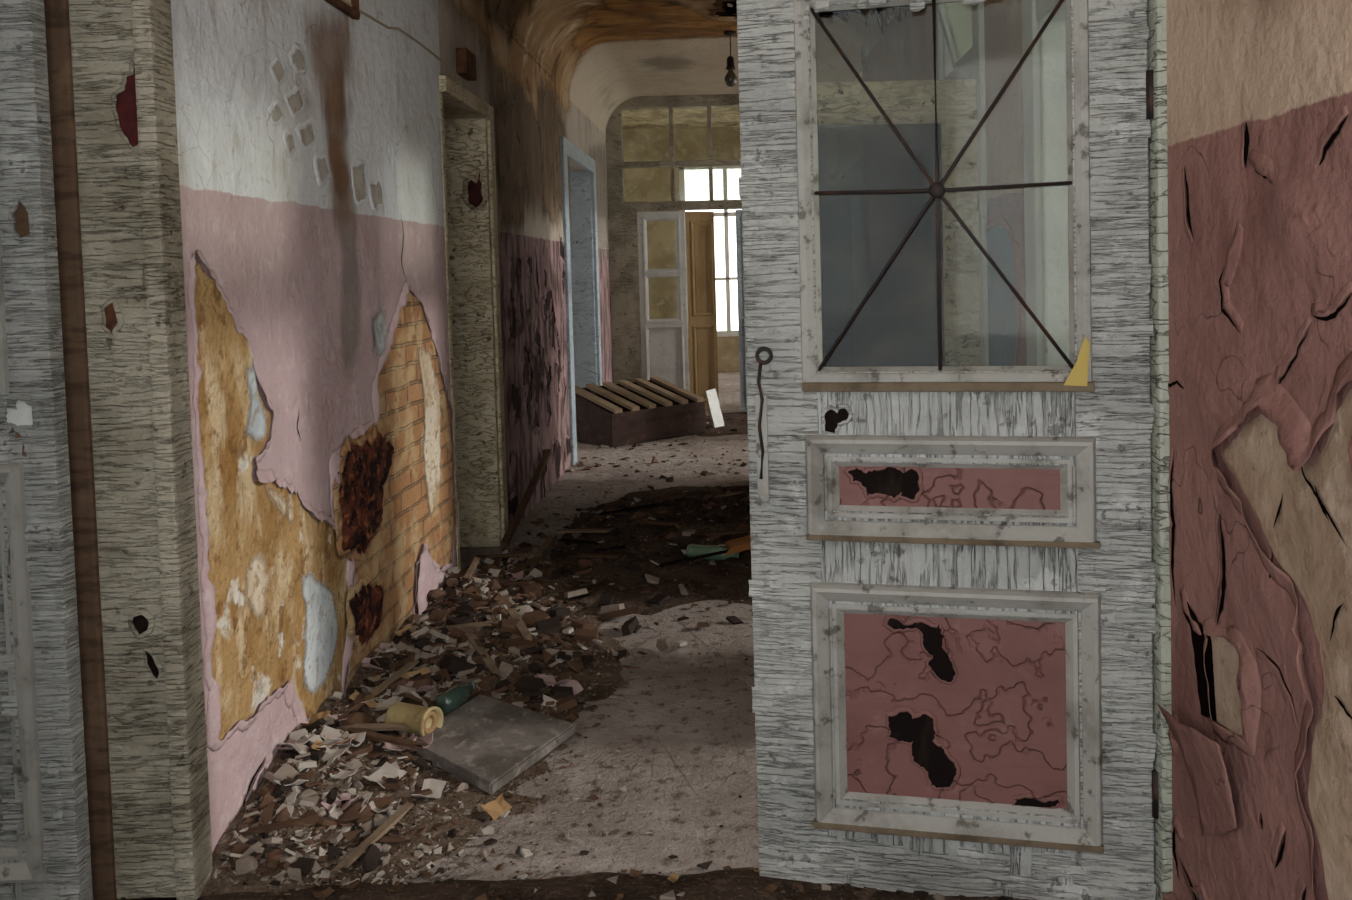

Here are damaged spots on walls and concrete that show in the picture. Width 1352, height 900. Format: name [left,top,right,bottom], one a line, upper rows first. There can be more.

crack [1181,167,1194,245]
crack [1240,123,1274,185]
crack [1317,105,1349,165]
crack [1219,221,1244,332]
crack [1274,281,1352,385]
crack [1168,380,1184,397]
peeling [188,250,457,752]
crack [1167,448,1226,639]
peeling [1210,351,1352,900]
peeling [1187,602,1262,756]
crack [1172,814,1199,900]
crack [1255,811,1306,900]